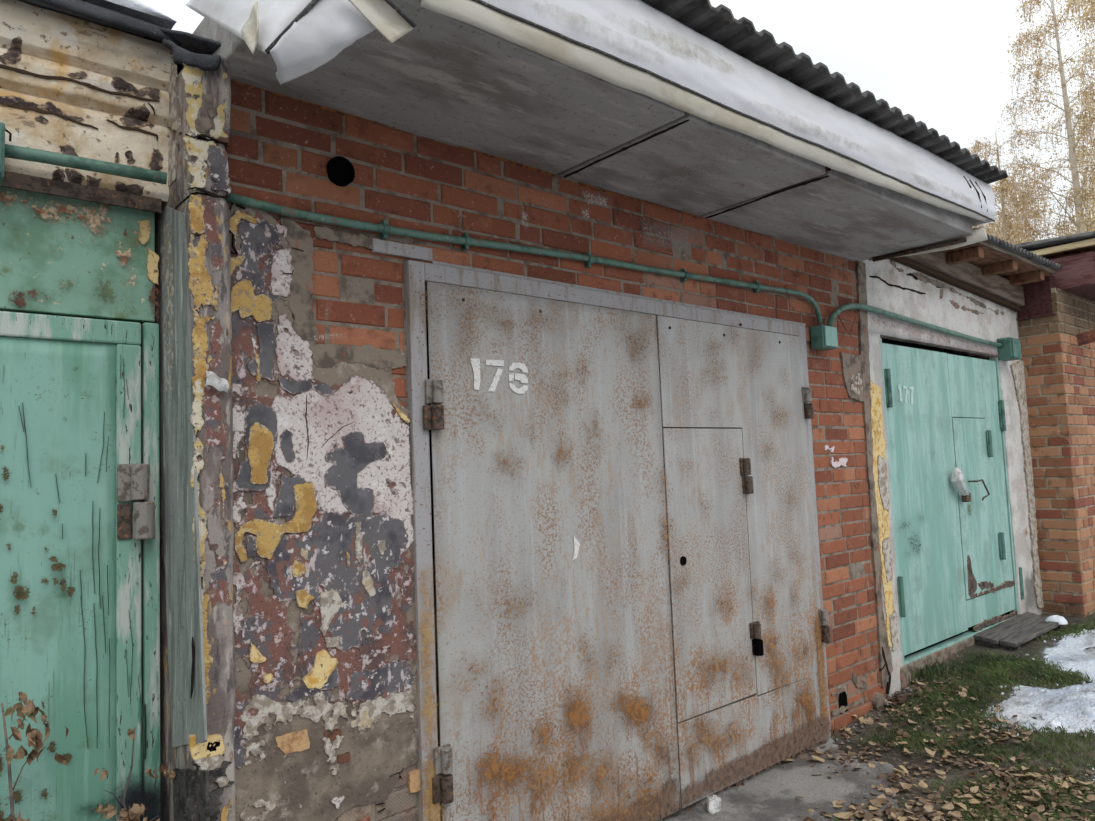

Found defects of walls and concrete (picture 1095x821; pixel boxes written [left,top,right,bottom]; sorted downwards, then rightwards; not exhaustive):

spalling [0,36,22,64]
spalling [68,71,87,79]
spalling [0,95,83,124]
spalling [60,144,78,156]
spalling [40,168,102,188]
peeling [0,189,112,235]
peeling [111,63,418,821]
peeling [870,380,900,651]
rust [967,555,1015,598]
rust [452,542,832,821]
spalling [408,769,420,793]